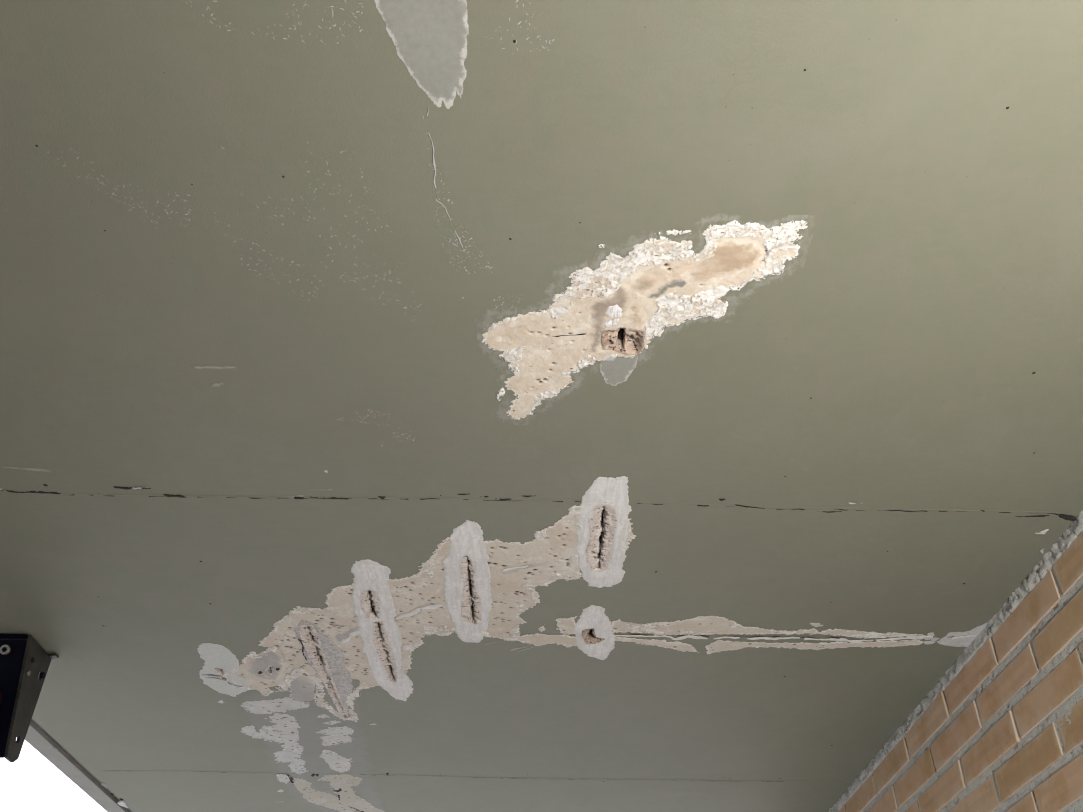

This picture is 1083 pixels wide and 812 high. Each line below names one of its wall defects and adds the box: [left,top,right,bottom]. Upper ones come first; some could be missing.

flaking render [476,213,819,425]
crack [0,470,582,502]
flaking render [619,518,636,550]
crack [629,499,1076,553]
flaking render [230,505,584,812]